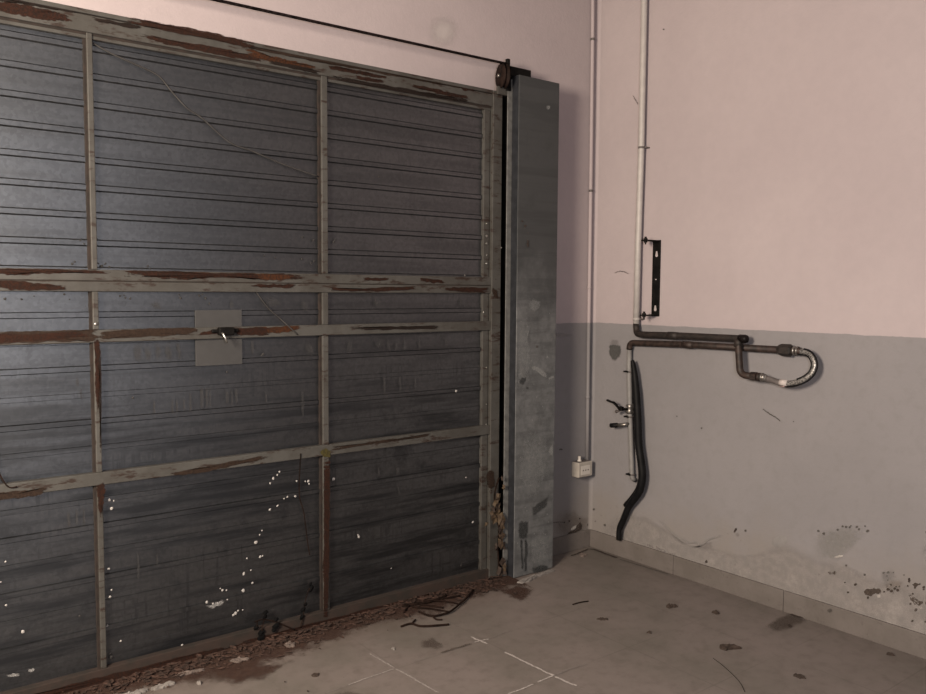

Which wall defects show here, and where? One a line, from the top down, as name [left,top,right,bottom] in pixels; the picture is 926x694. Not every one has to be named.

corrosion [0,0,76,22]
corrosion [0,38,111,291]
corrosion [92,17,475,274]
corrosion [125,270,304,288]
corrosion [332,277,498,298]
corrosion [0,292,218,473]
corrosion [0,488,46,500]
corrosion [36,292,532,694]
spalling [844,578,926,625]